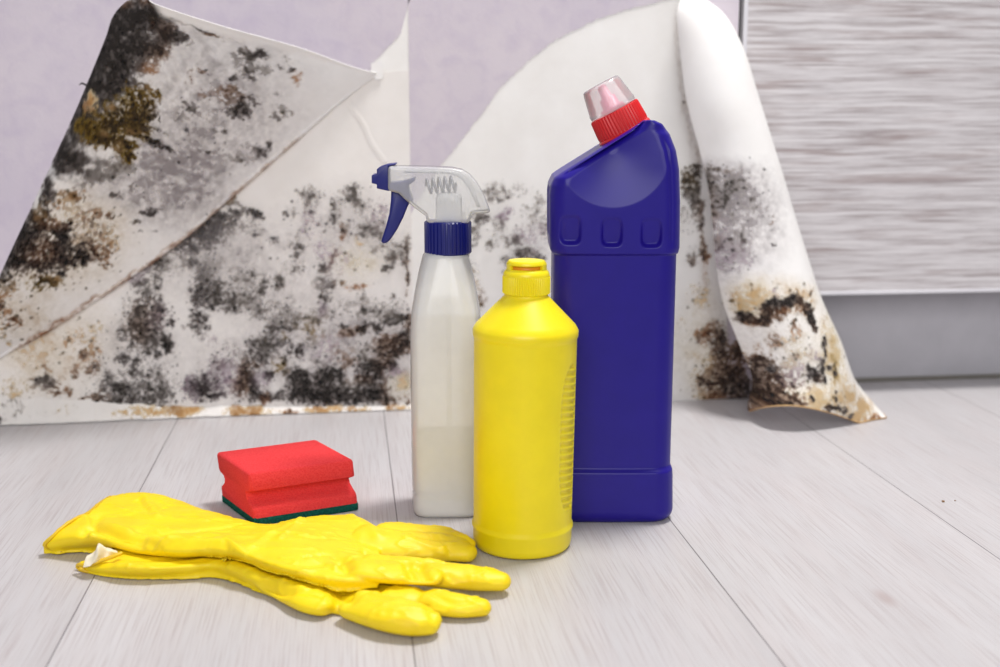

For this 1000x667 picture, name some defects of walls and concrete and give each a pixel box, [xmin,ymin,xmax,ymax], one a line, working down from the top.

peeling [0,0,377,358]
leakage [2,182,411,407]
leakage [462,182,548,273]
leakage [680,163,881,422]
peeling [805,335,838,384]
peeling [810,390,854,419]